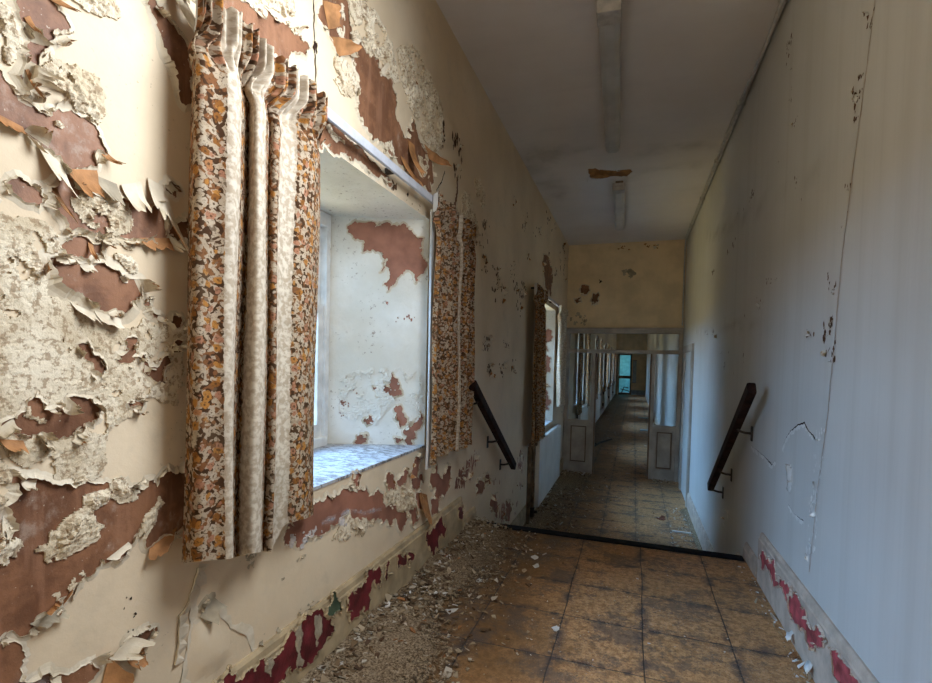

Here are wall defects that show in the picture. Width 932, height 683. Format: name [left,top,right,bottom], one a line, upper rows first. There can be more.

crack [311,0,319,93]
peeling [314,0,464,194]
peeling [0,0,196,389]
peeling [346,219,429,305]
peeling [0,389,185,683]
peeling [211,550,416,683]
peeling [280,372,523,562]
peeling [758,549,860,683]